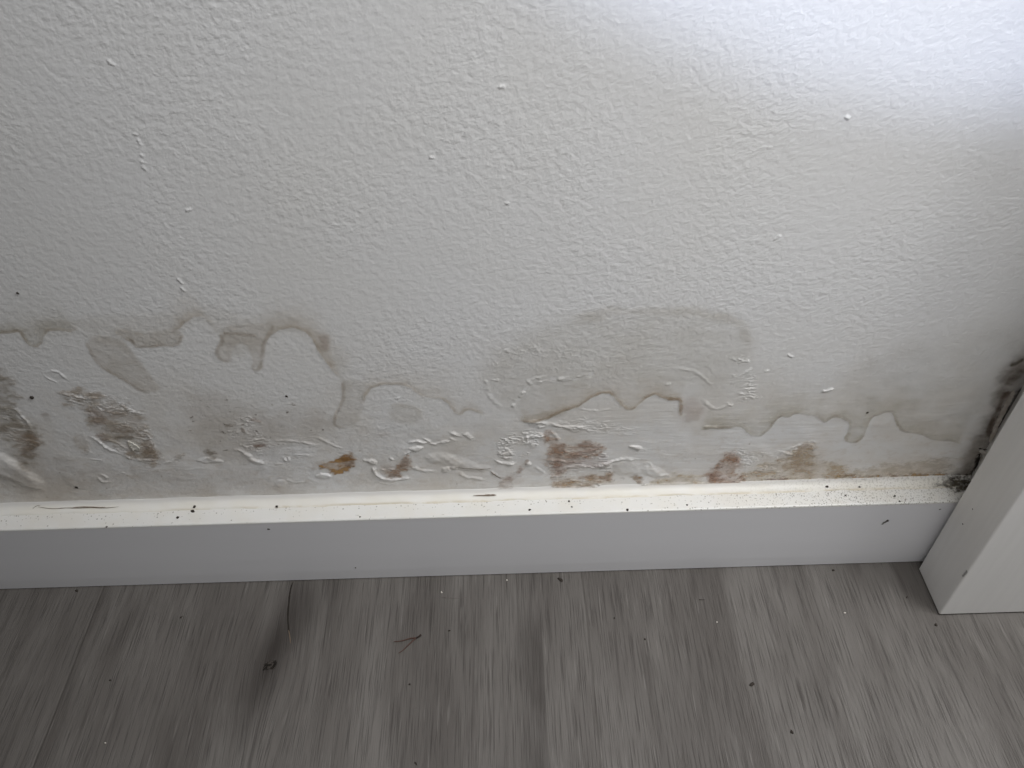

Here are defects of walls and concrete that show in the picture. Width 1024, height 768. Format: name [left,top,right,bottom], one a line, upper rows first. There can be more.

mould [982,360,1024,438]
mould [937,458,980,493]